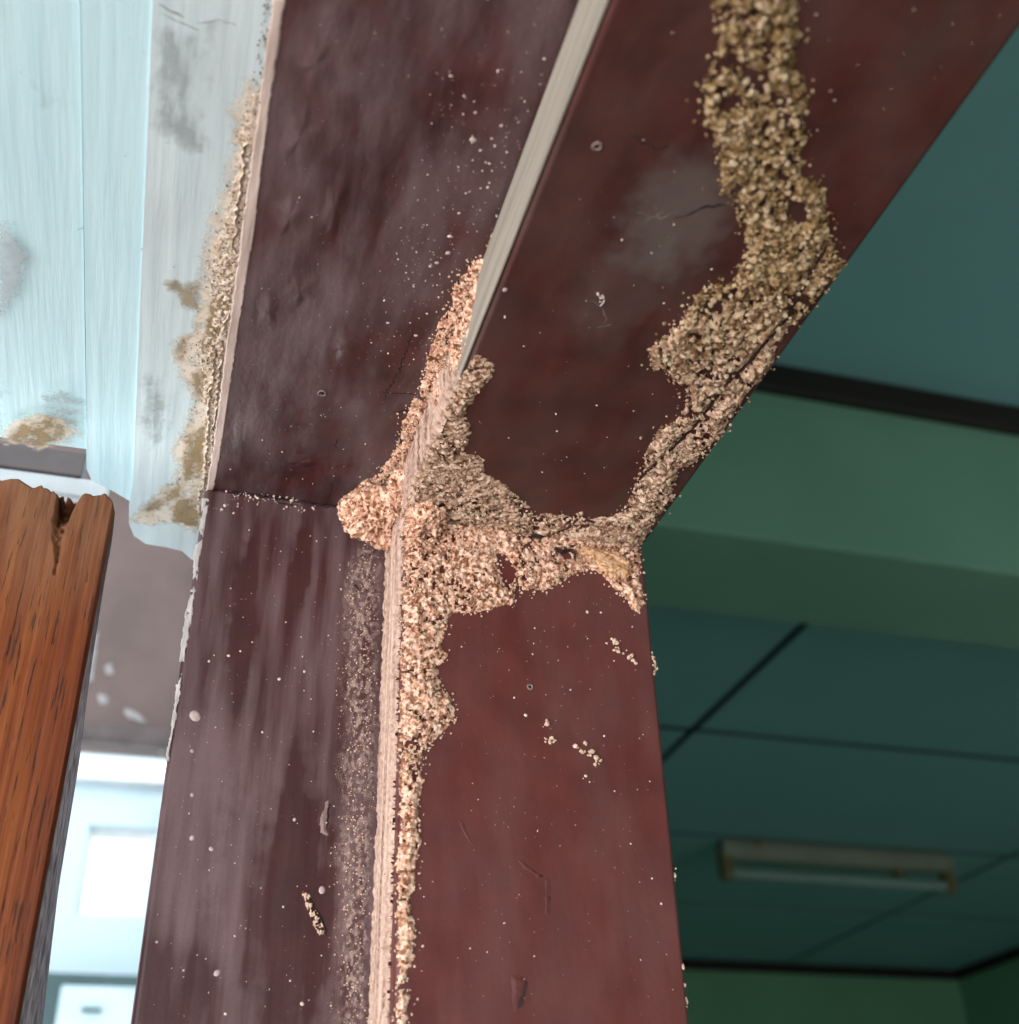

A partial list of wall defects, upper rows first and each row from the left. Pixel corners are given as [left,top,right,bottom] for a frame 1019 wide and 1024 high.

crack [674,203,727,218]
water stain [133,83,260,530]
water stain [4,392,79,449]